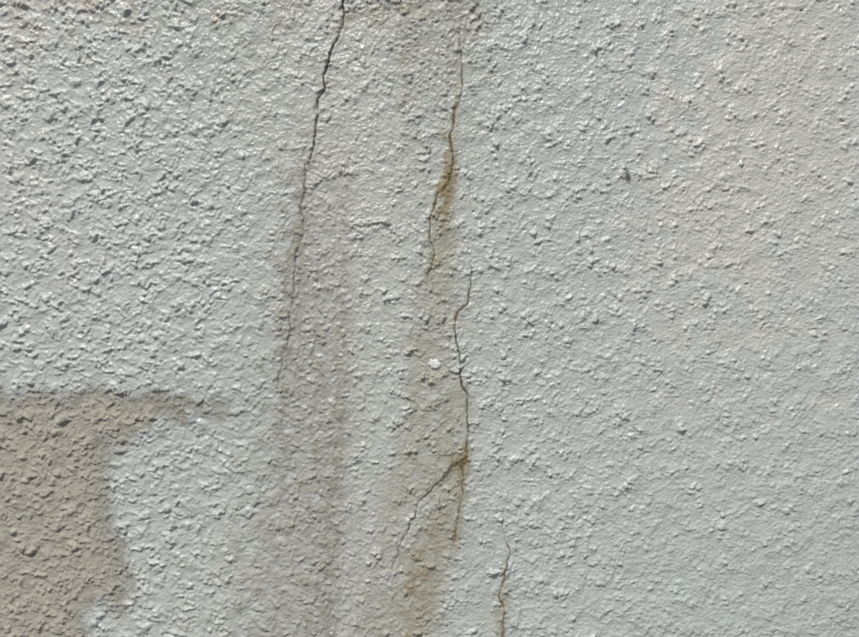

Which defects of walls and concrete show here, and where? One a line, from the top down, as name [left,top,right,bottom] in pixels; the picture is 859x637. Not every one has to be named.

crack [300,0,345,220]
crack [428,69,463,274]
crack [397,270,472,556]
crack [498,546,511,637]